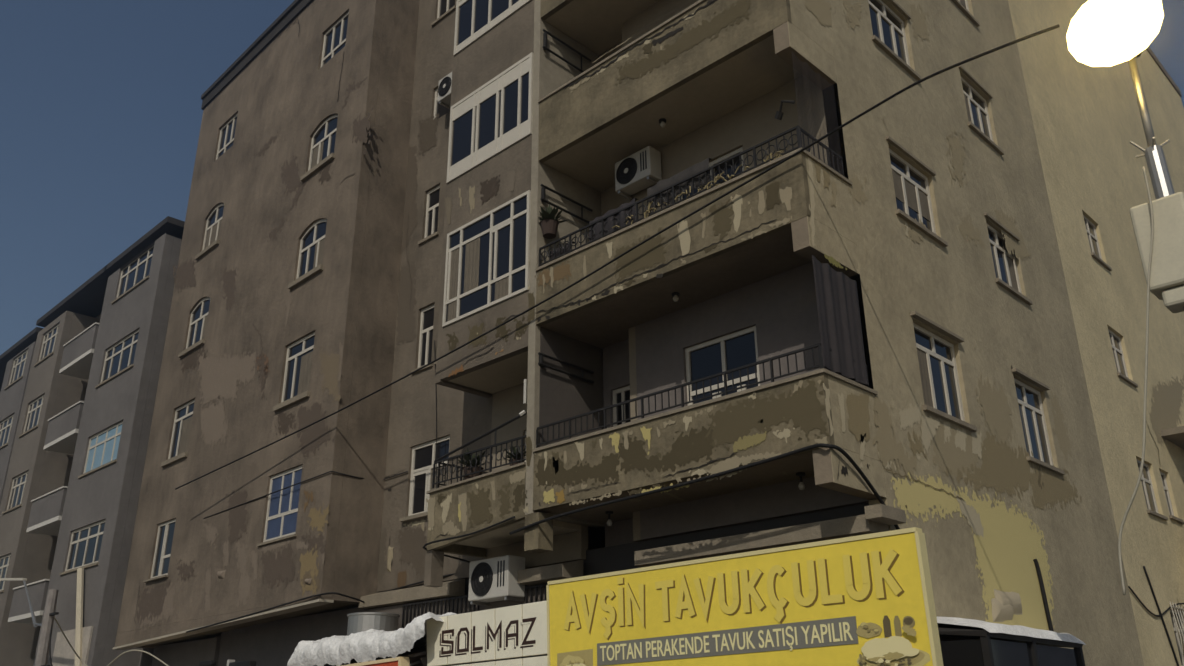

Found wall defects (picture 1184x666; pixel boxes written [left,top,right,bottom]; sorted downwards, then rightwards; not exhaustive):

peeling [569,380,833,505]
peeling [509,469,527,484]
peeling [523,489,555,513]
peeling [403,519,460,536]